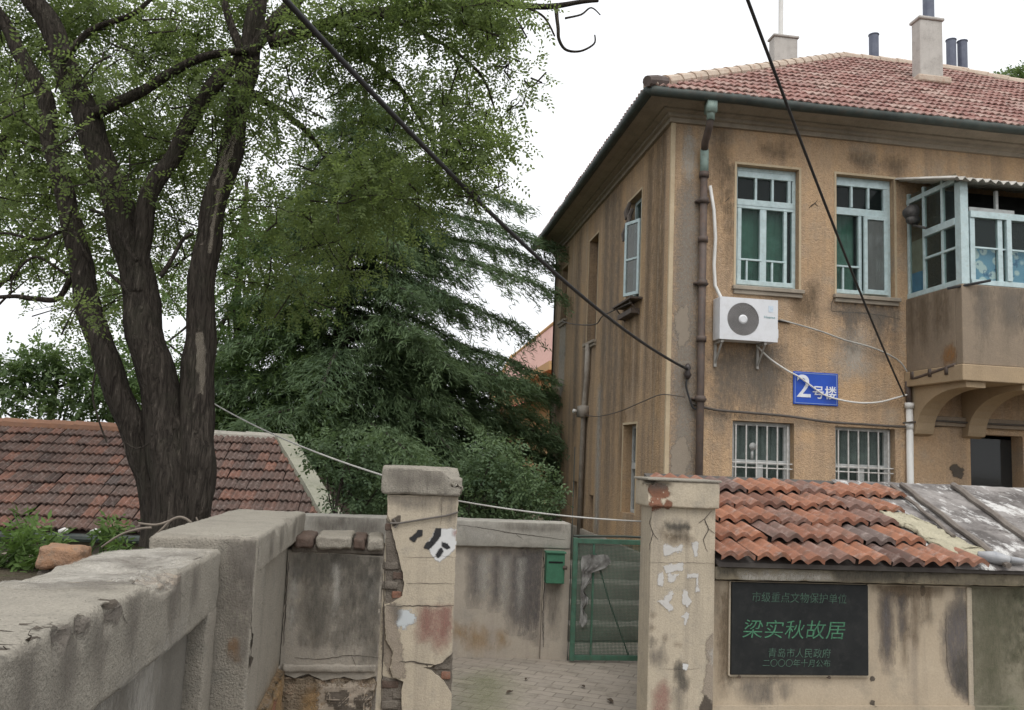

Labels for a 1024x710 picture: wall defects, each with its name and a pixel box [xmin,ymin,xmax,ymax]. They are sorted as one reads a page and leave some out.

crack [649,511,715,564]
spalling [6,597,122,646]
spalling [316,515,406,710]
spalling [426,653,453,693]
leakage [471,554,557,623]
leakage [834,571,942,657]
leakage [946,588,968,697]